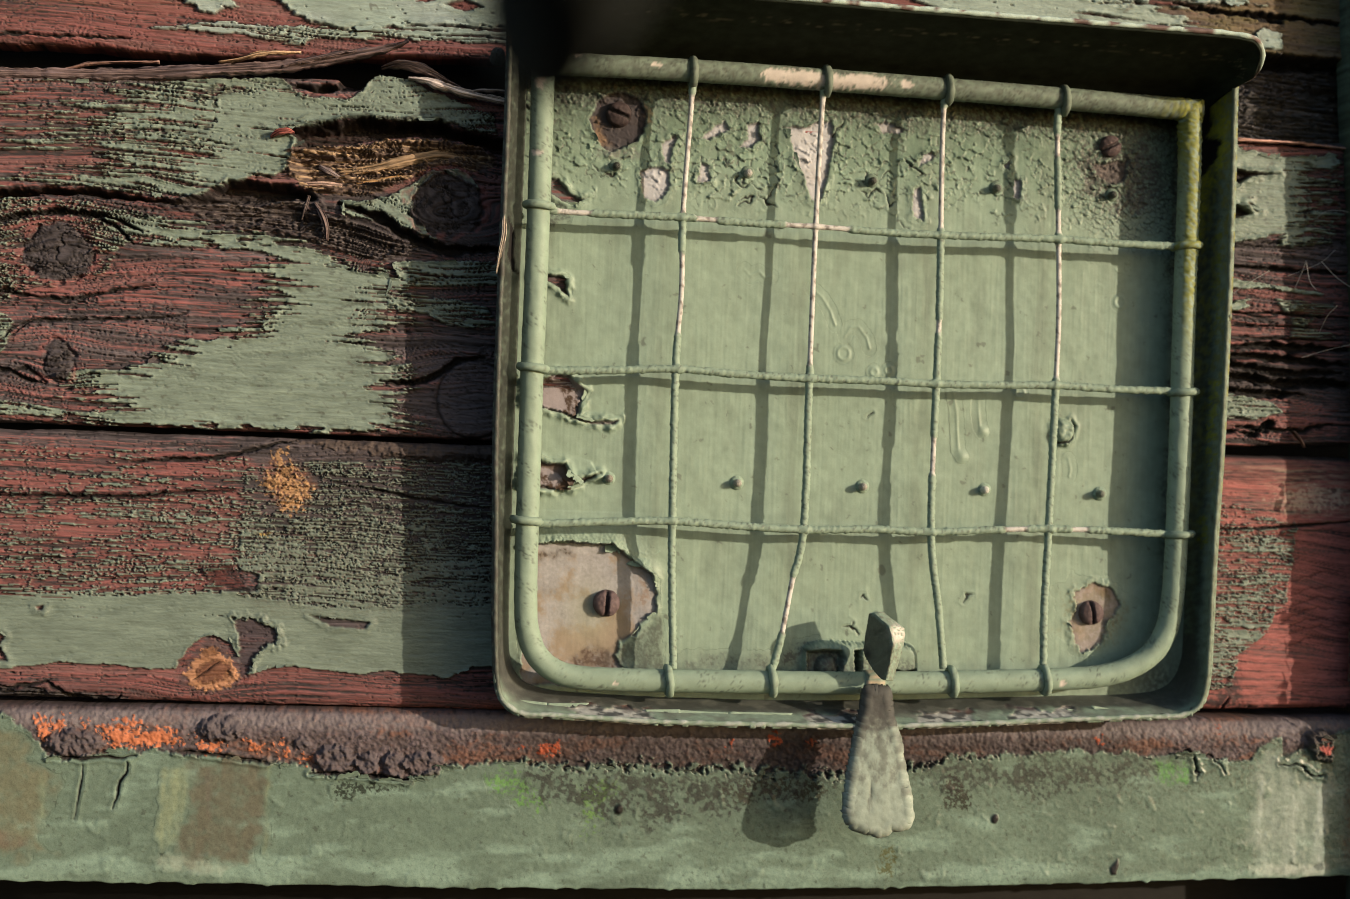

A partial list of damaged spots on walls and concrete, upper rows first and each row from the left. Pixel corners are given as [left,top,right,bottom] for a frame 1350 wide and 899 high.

peeling [0,0,490,61]
peeling [1069,0,1341,55]
crack [591,156,618,180]
crack [733,174,784,209]
crack [830,114,846,161]
crack [858,157,953,230]
peeling [1234,144,1346,253]
peeling [0,75,503,684]
peeling [540,455,605,495]
peeling [537,536,662,663]
corrosion [0,706,854,787]
corrosion [899,718,1350,869]